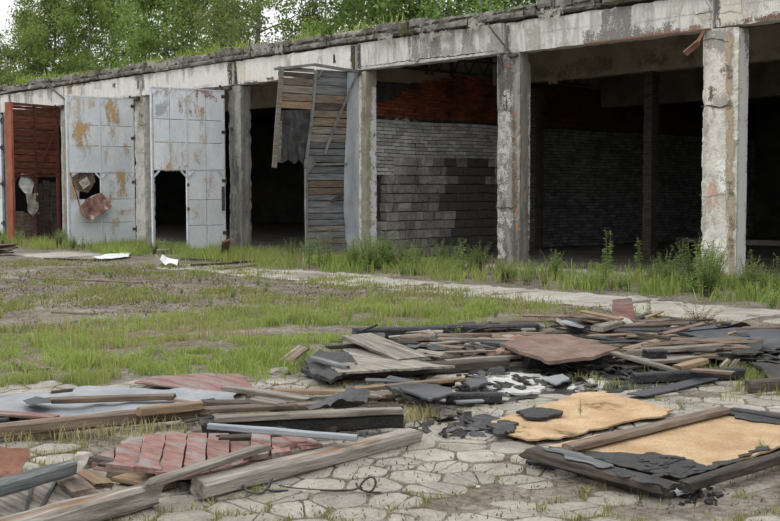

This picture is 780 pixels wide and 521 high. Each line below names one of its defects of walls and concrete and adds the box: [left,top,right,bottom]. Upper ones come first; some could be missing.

peeling [419,29,454,41]
spalling [468,17,486,34]
spalling [540,7,563,21]
corrosion [68,96,129,165]
corrosion [153,87,217,172]
spalling [701,0,780,276]
corrosion [105,169,135,235]
peeling [497,90,516,263]